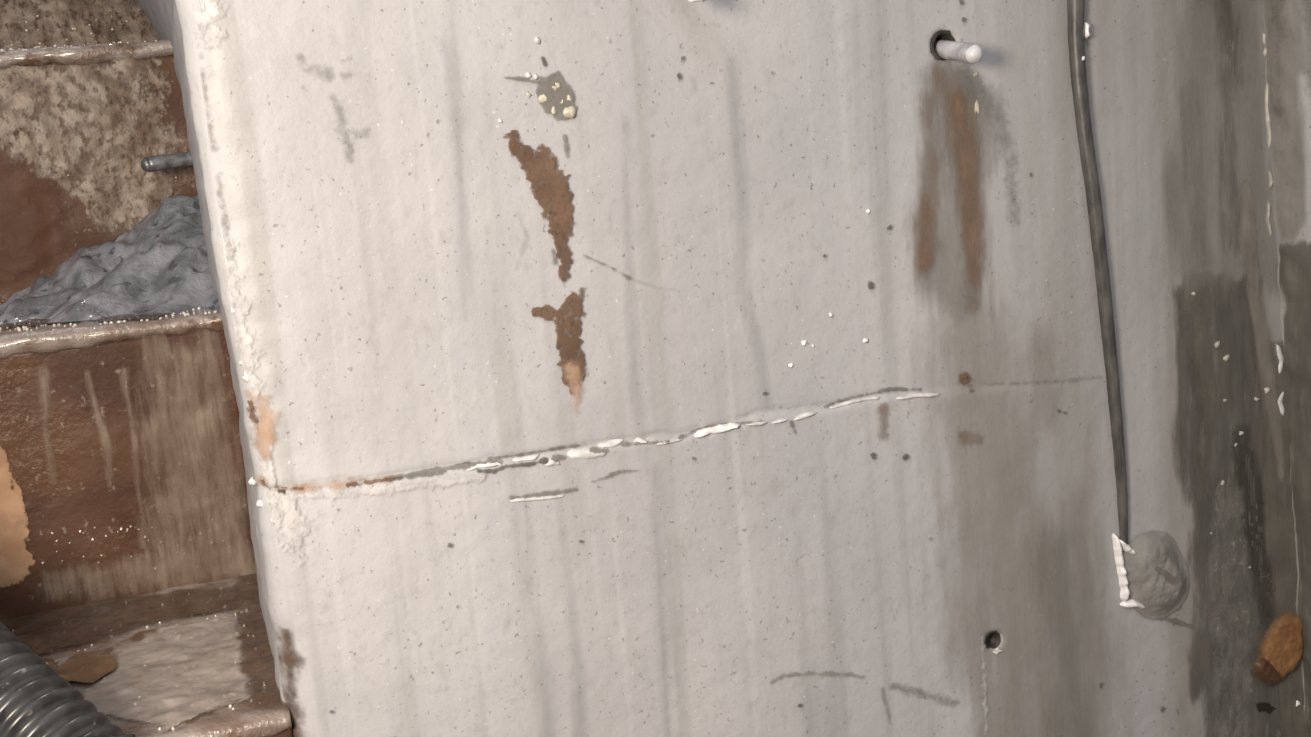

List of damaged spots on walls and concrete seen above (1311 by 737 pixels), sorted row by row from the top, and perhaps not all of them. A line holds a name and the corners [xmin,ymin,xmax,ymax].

corrosion [918,67,1000,307]
crack [284,387,941,502]
water stain [1167,0,1311,737]